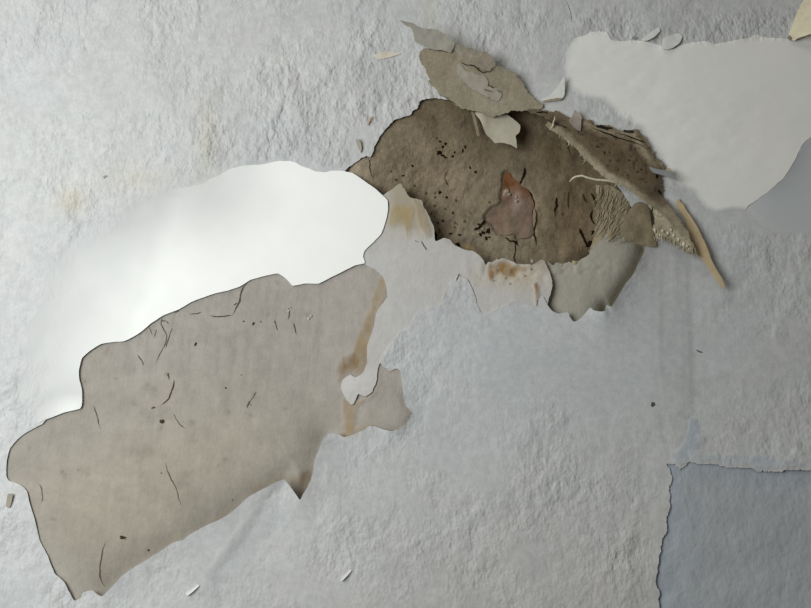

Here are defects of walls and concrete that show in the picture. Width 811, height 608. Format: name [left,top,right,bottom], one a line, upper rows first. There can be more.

peeling [453,44,502,101]
spalling [6,98,645,601]